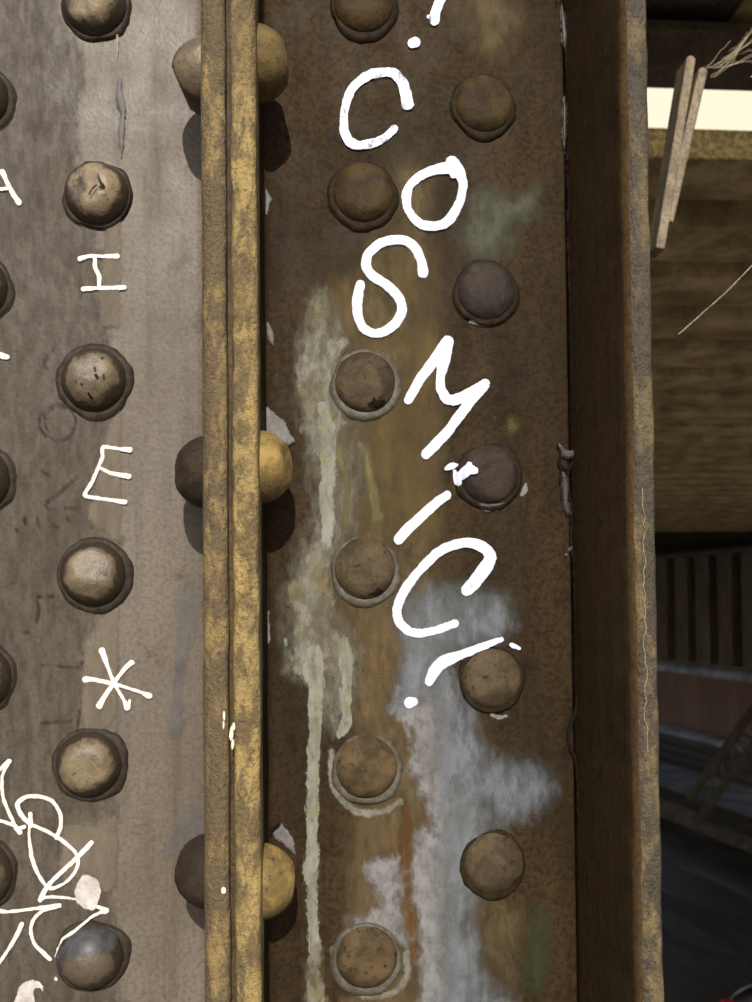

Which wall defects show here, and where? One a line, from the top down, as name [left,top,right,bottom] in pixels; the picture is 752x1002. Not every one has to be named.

rust [323,278,355,334]
rust [353,263,437,539]
rust [334,604,409,727]
water stain [281,168,546,1002]
rust [353,802,418,964]
rust [340,987,414,1002]